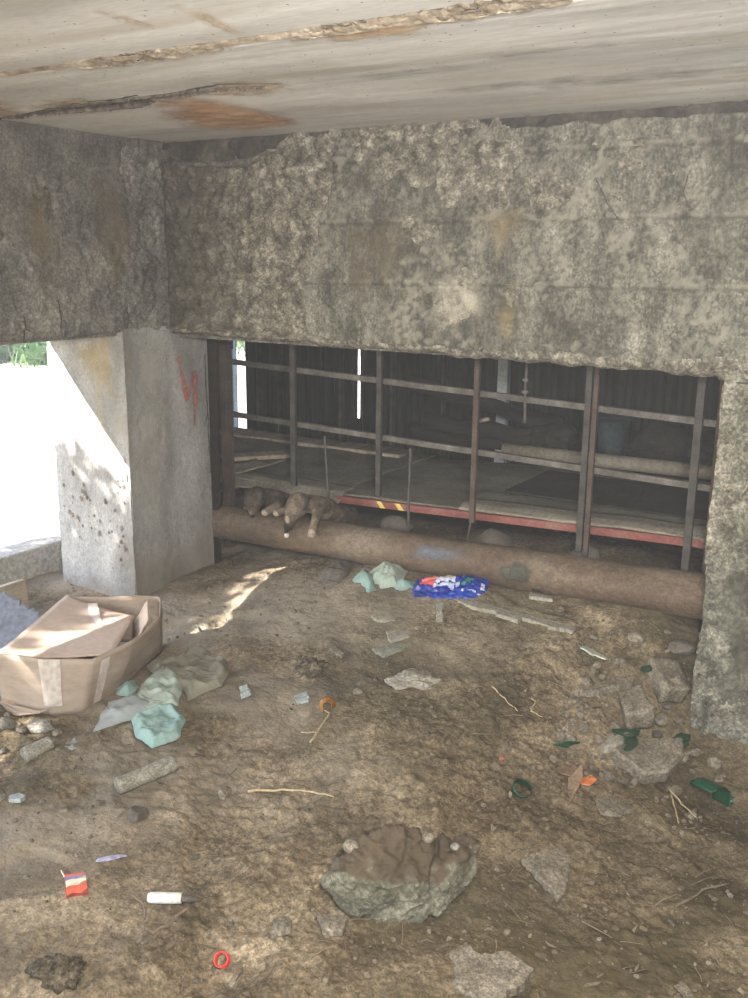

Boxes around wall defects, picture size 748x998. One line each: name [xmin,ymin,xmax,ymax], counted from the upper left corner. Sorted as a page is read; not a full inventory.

corrosion [160,83,287,129]
spalling [119,117,748,575]